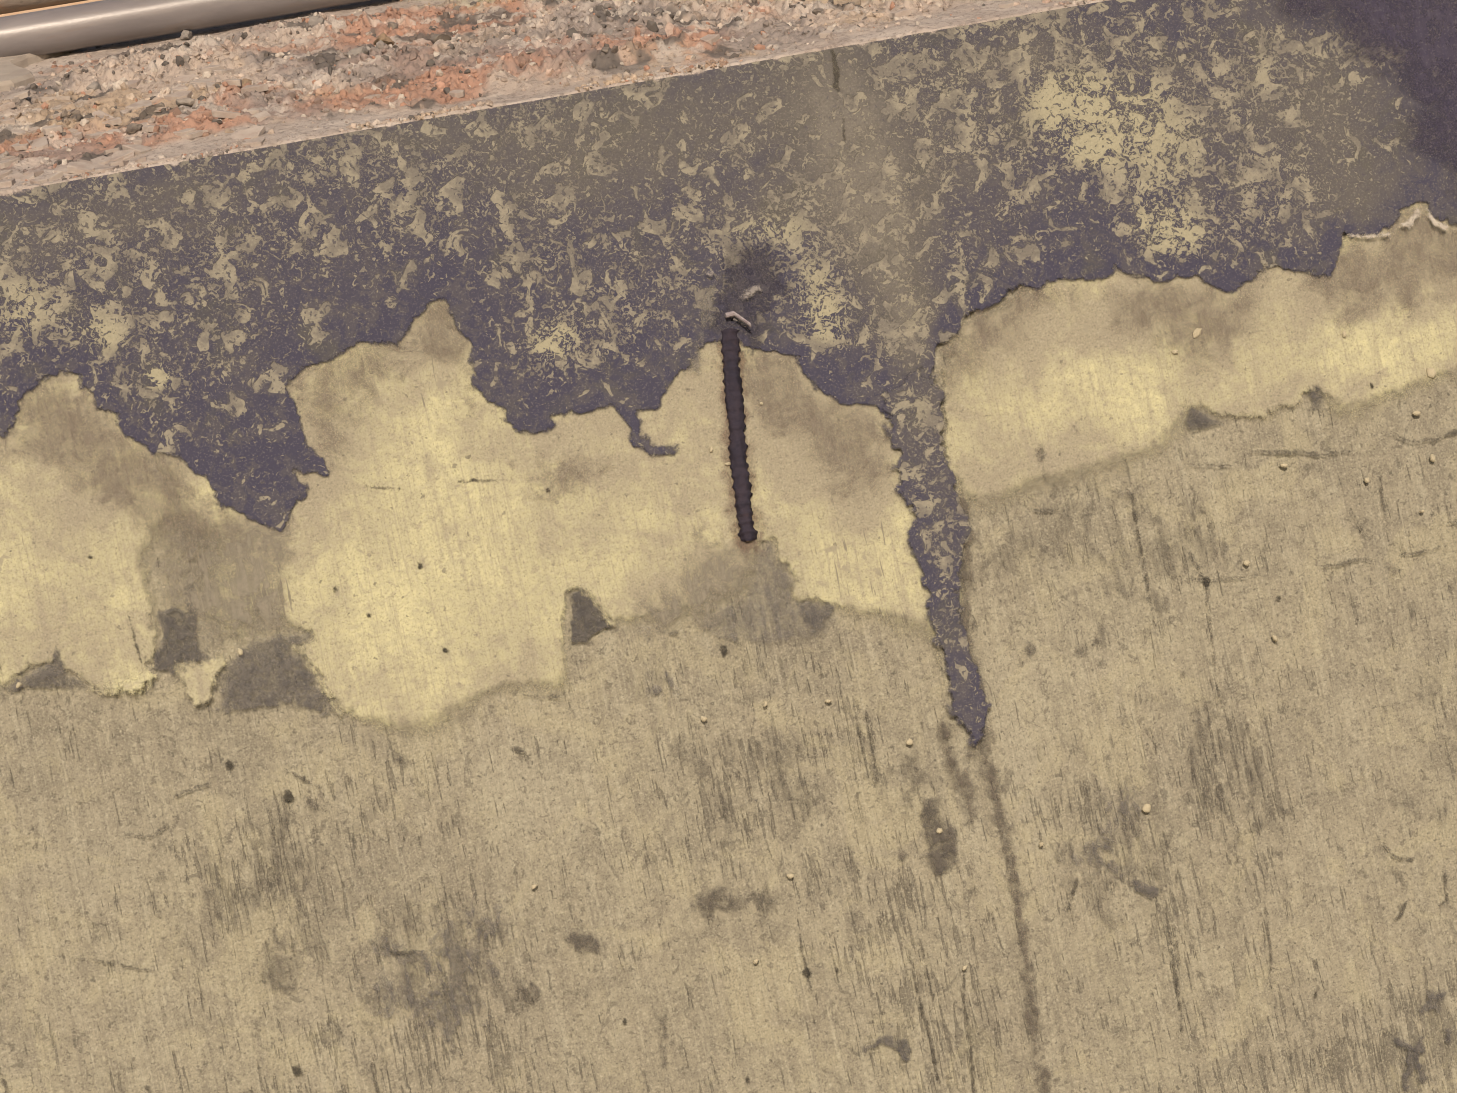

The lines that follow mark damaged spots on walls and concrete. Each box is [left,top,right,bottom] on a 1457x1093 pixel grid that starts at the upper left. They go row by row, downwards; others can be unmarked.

damp [1287,0,1457,169]
damp [21,391,288,640]
peeling [0,250,936,729]
peeling [929,201,1457,506]
damp [748,357,1051,1092]